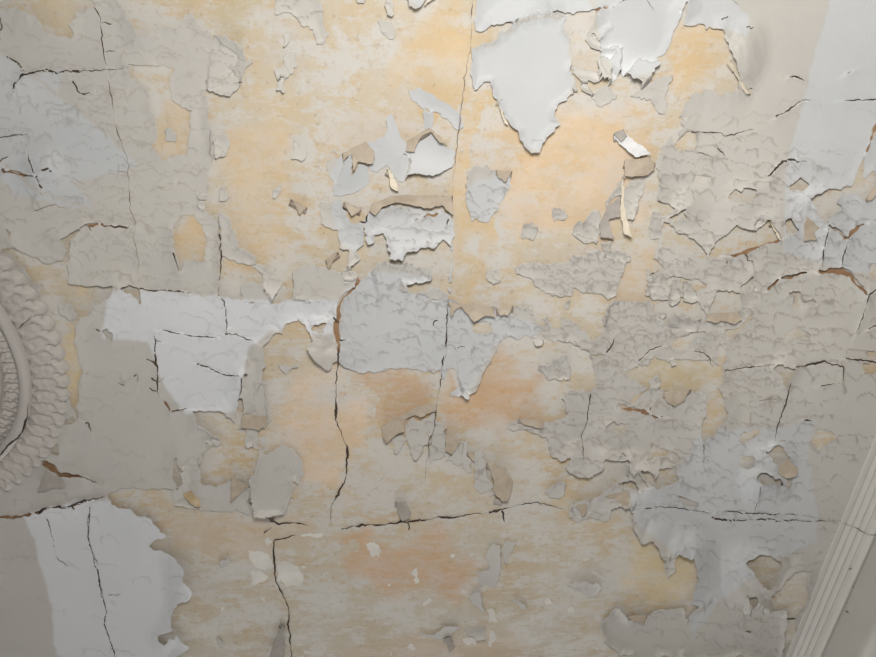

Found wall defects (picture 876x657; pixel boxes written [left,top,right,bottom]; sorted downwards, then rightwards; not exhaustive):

crack [0,460,119,656]
peeling [3,221,149,494]
crack [0,8,191,293]
water stain [200,0,305,284]
peeling [161,0,454,306]
water stain [149,338,570,657]
crack [330,277,564,530]
peeling [99,319,819,657]
water stain [314,0,664,312]
peeling [448,9,822,359]
water stain [652,12,739,108]
crack [767,223,876,332]